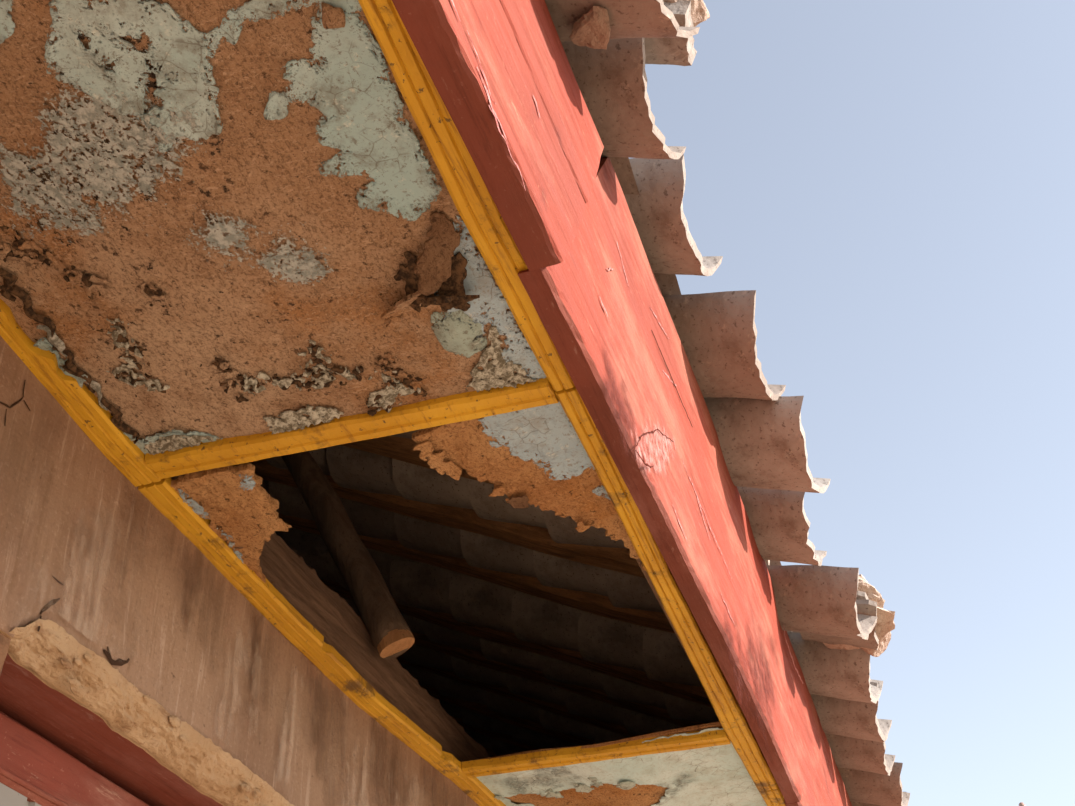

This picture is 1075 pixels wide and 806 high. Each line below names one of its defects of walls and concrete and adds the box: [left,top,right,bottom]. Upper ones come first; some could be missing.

peeling [0,0,537,455]
crack [0,380,30,426]
peeling [413,441,462,480]
peeling [638,432,671,470]
peeling [488,486,510,501]
peeling [275,518,292,532]
peeling [575,520,591,532]
peeling [494,778,668,806]